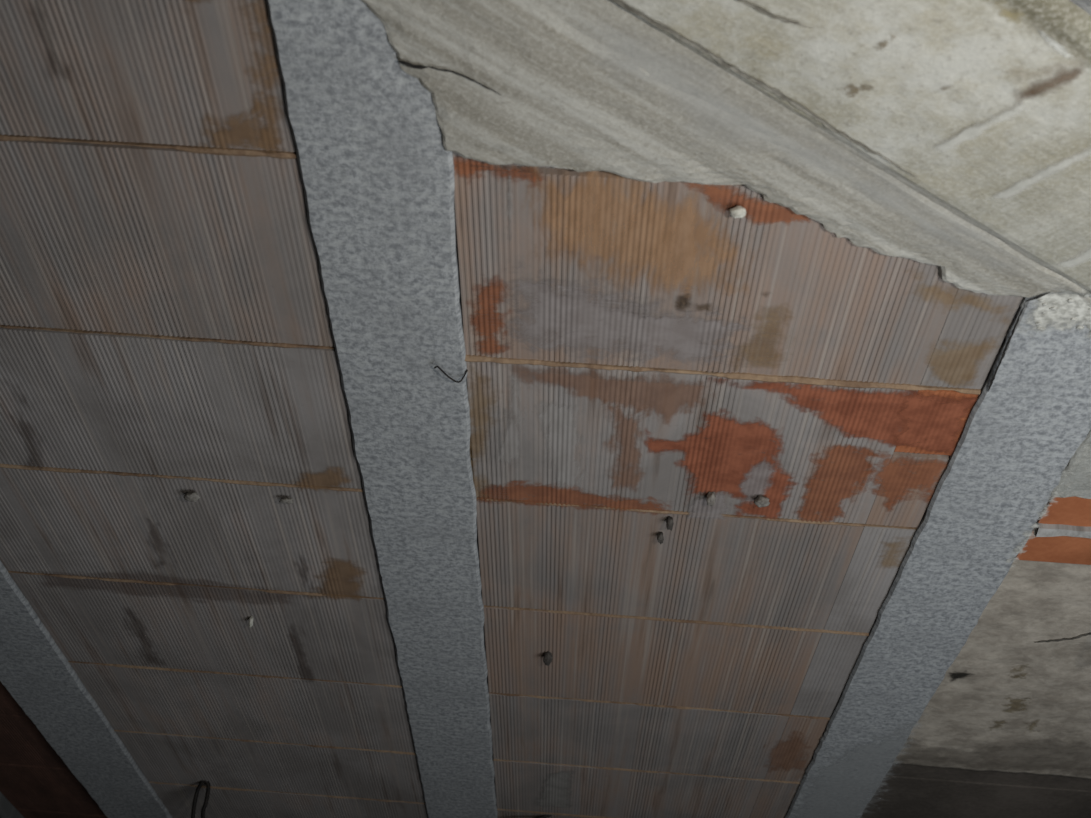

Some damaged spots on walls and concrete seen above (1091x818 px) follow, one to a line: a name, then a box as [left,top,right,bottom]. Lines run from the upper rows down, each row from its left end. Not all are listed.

peeling [453,157,542,183]
peeling [689,183,809,223]
peeling [471,281,507,354]
peeling [478,366,977,522]